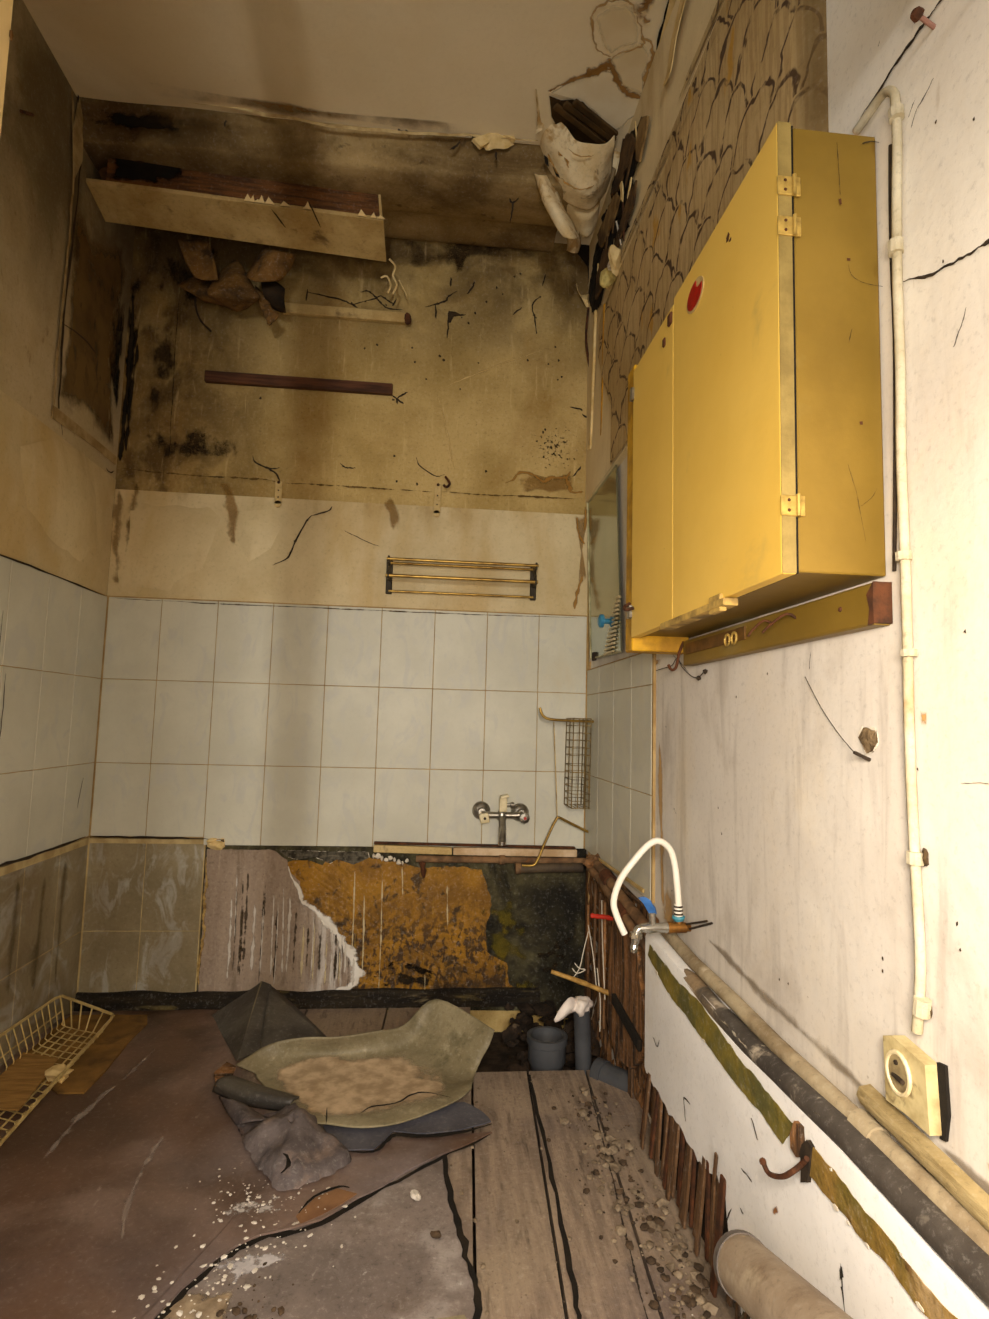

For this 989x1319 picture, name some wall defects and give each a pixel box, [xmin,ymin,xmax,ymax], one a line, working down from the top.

damp [97,111,210,131]
damp [242,99,348,117]
damp [549,0,655,129]
peeling [534,89,649,314]
crack [903,239,989,282]
damp [61,222,175,461]
damp [156,430,235,457]
crack [106,303,581,565]
peeling [198,838,513,992]